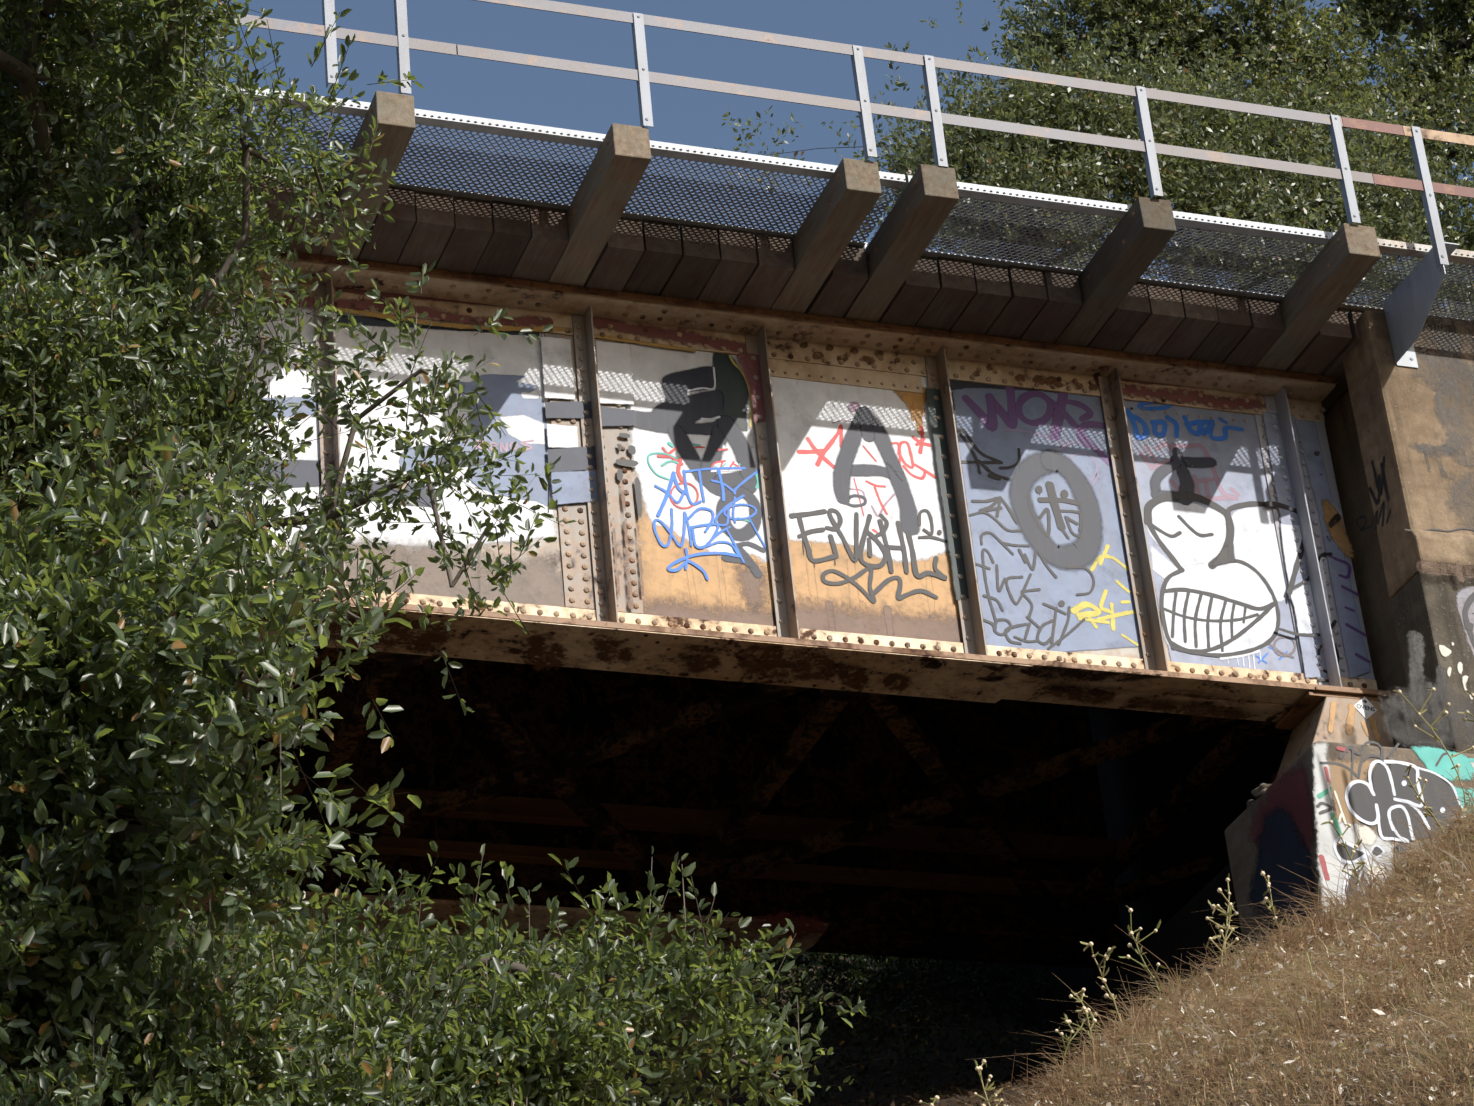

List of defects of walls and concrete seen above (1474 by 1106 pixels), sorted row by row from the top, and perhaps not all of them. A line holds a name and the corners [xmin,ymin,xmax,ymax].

corrosion [799,342,896,365]
corrosion [1015,374,1098,390]
leakage [1414,310,1474,528]
corrosion [313,611,456,654]
corrosion [523,634,567,672]
corrosion [592,634,633,664]
corrosion [679,645,720,674]
corrosion [977,663,1257,721]